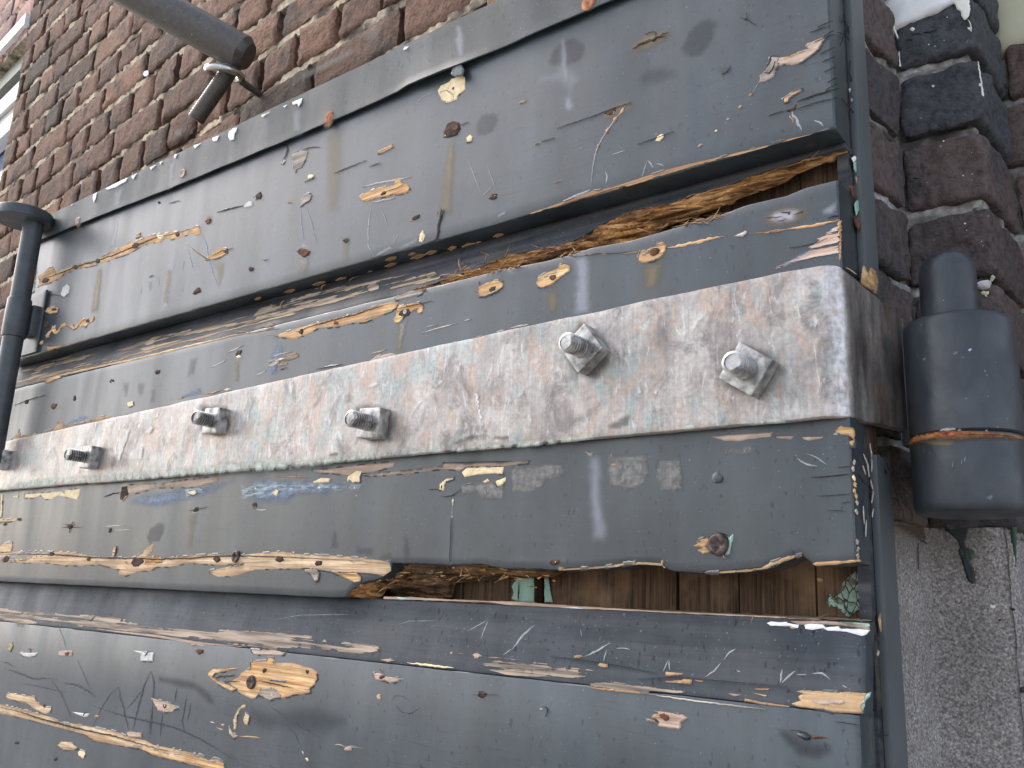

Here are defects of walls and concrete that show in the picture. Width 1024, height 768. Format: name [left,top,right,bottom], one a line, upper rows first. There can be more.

peeling [738,35,829,108]
crack [427,208,444,244]
spalling [17,88,861,383]
crack [576,249,641,257]
crack [667,211,840,248]
peeling [11,401,141,440]
rust [909,429,1023,451]
spalling [0,426,882,636]
peeling [0,608,404,740]
peeling [407,652,871,730]
peeling [58,741,86,759]